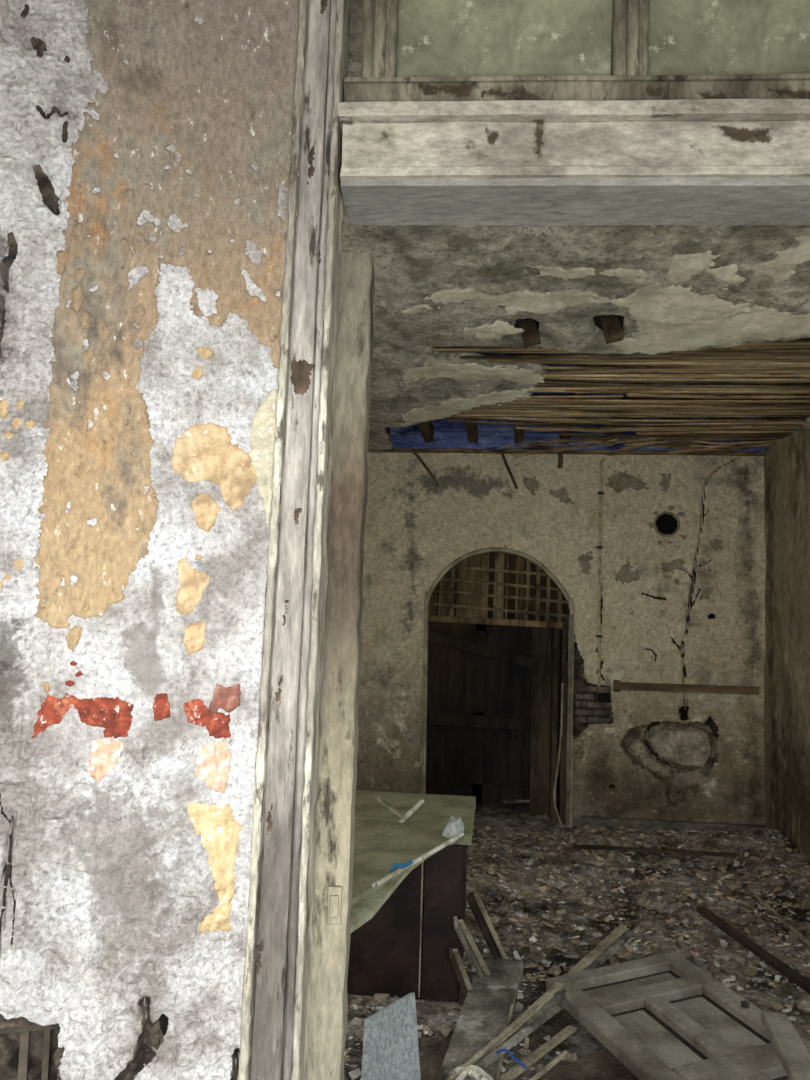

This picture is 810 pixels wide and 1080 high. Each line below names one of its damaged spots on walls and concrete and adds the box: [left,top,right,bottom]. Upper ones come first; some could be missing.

peeling [0,0,316,629]
peeling [402,237,810,355]
peeling [399,362,544,426]
flaking render [523,476,575,504]
flaking render [606,470,671,494]
peeling [175,554,210,654]
flaking render [612,562,640,584]
crack [641,459,736,708]
flaking render [563,586,720,810]
crack [0,793,16,945]
spalling [0,1014,65,1080]
flaking render [230,1048,240,1080]